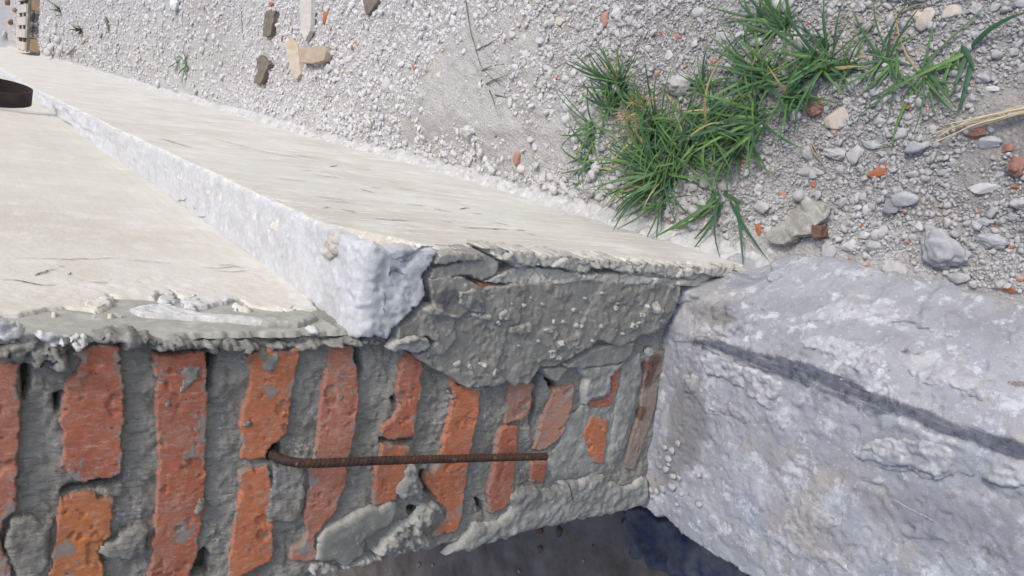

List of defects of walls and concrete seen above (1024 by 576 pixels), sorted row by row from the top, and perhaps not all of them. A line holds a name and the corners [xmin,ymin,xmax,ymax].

peeling [384,335,430,353]
leakage [691,339,1024,459]